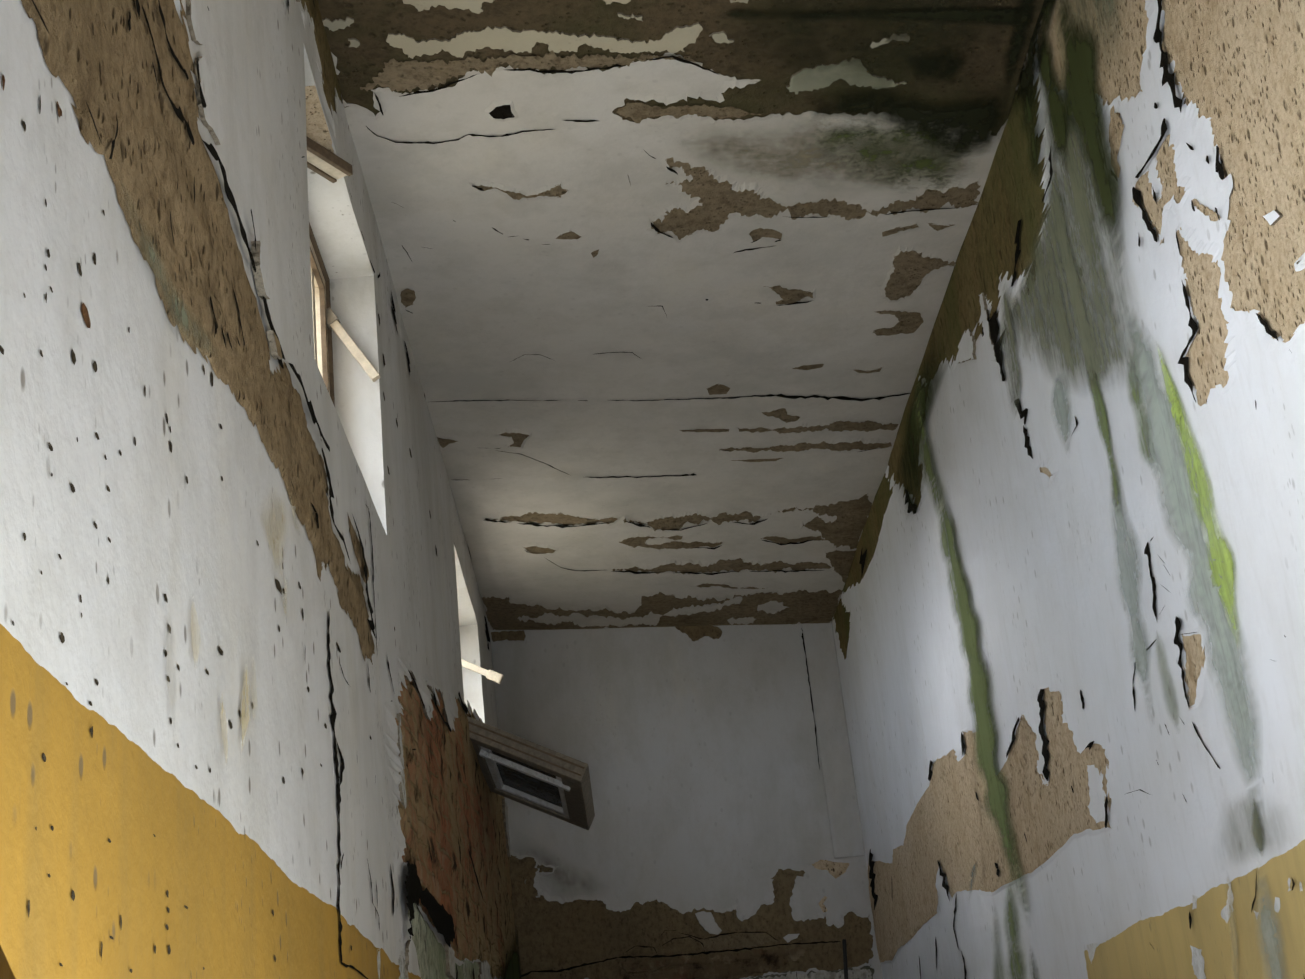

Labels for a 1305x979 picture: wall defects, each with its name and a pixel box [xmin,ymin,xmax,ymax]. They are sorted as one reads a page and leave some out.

flaking render [21,0,376,665]
crack [305,504,399,979]
flaking render [370,655,1117,979]
flaking render [296,0,1305,664]
leakage [900,362,939,502]
leakage [713,0,1153,460]
leakage [995,895,1038,979]
leakage [1113,496,1147,680]
leakage [1159,355,1236,630]
leakage [1253,803,1263,852]